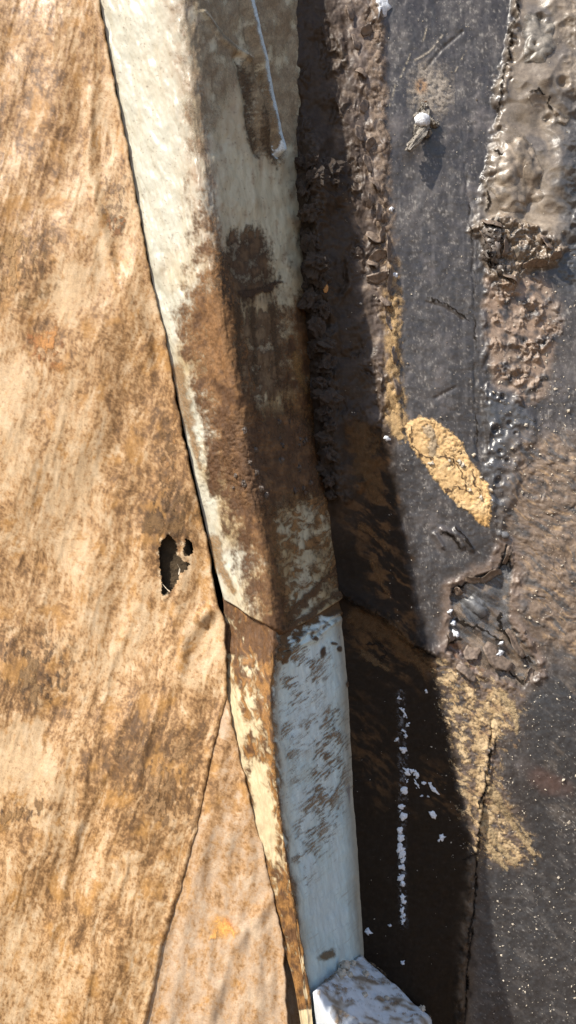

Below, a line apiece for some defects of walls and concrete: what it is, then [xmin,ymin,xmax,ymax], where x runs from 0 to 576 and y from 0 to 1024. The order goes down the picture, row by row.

corrosion [172,183,343,1010]
leakage [388,768,440,927]
leakage [348,611,541,869]
crack [462,702,497,1024]